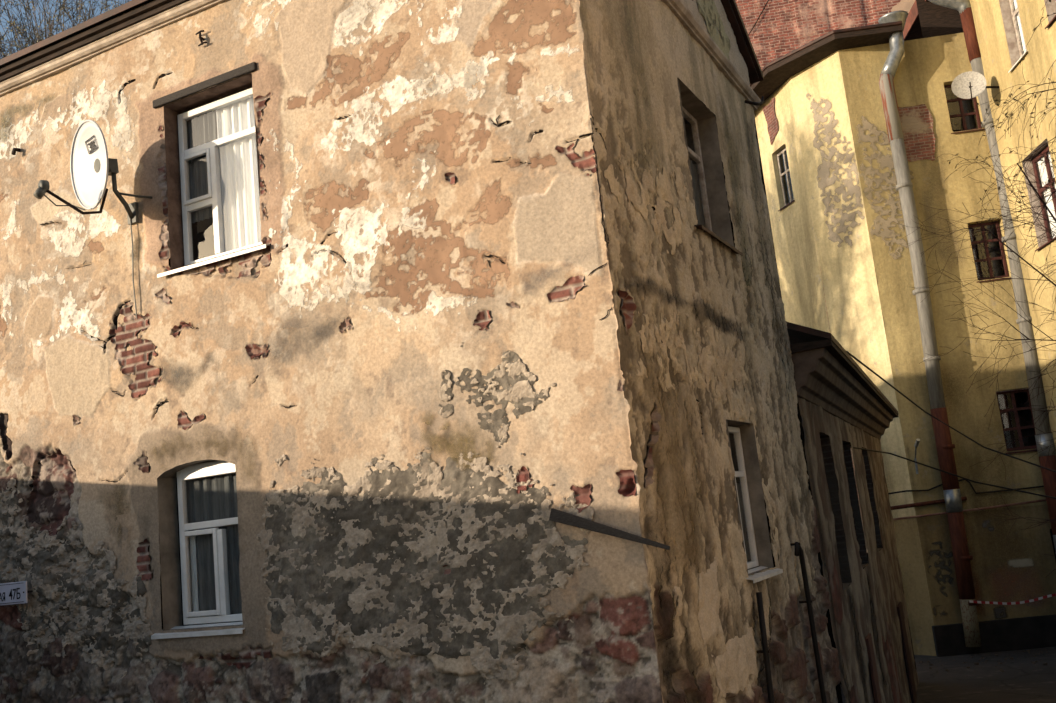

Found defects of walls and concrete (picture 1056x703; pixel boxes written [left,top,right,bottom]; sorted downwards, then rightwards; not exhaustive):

peeling [0,193,20,240]
peeling [155,0,578,333]
peeling [507,143,689,255]
peeling [806,94,909,260]
flaking render [898,104,935,179]
flaking render [0,203,163,400]
flaking render [245,343,269,360]
flaking render [438,350,556,448]
flaking render [547,275,586,303]
flaking render [0,413,153,679]
flaking render [199,447,594,688]